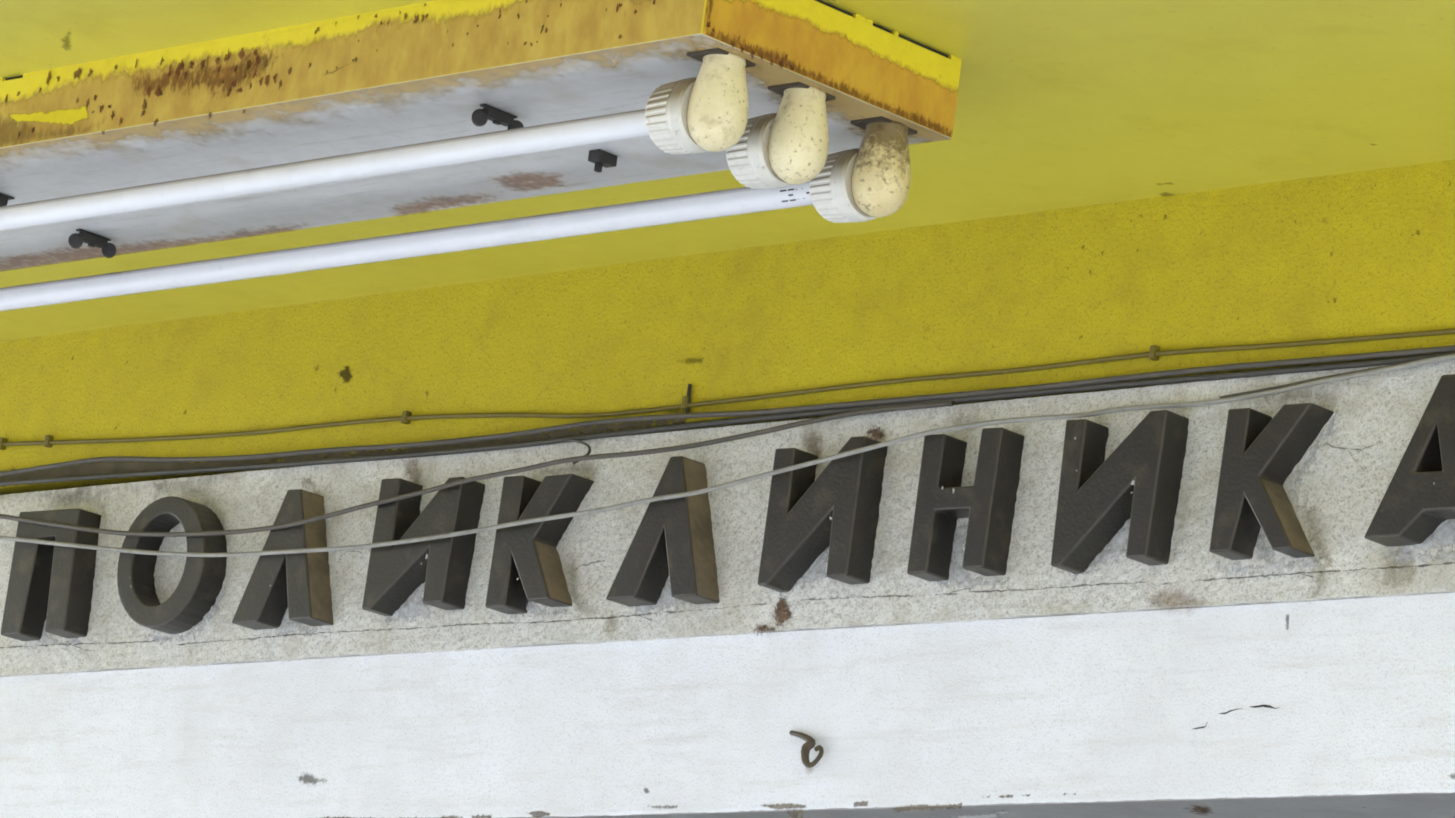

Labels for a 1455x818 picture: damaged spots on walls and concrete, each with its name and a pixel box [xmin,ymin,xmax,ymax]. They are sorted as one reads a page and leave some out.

corrosion [754,598,791,636]
peeling [763,803,806,818]
peeling [893,803,962,812]